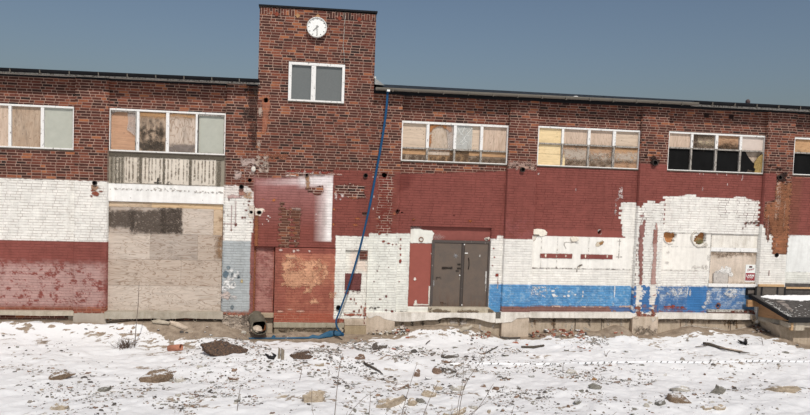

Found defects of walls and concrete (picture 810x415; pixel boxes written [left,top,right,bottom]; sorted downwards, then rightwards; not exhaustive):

peeling [286,170,366,210]
peeling [225,198,328,304]
peeling [638,215,658,296]
peeling [613,286,691,317]